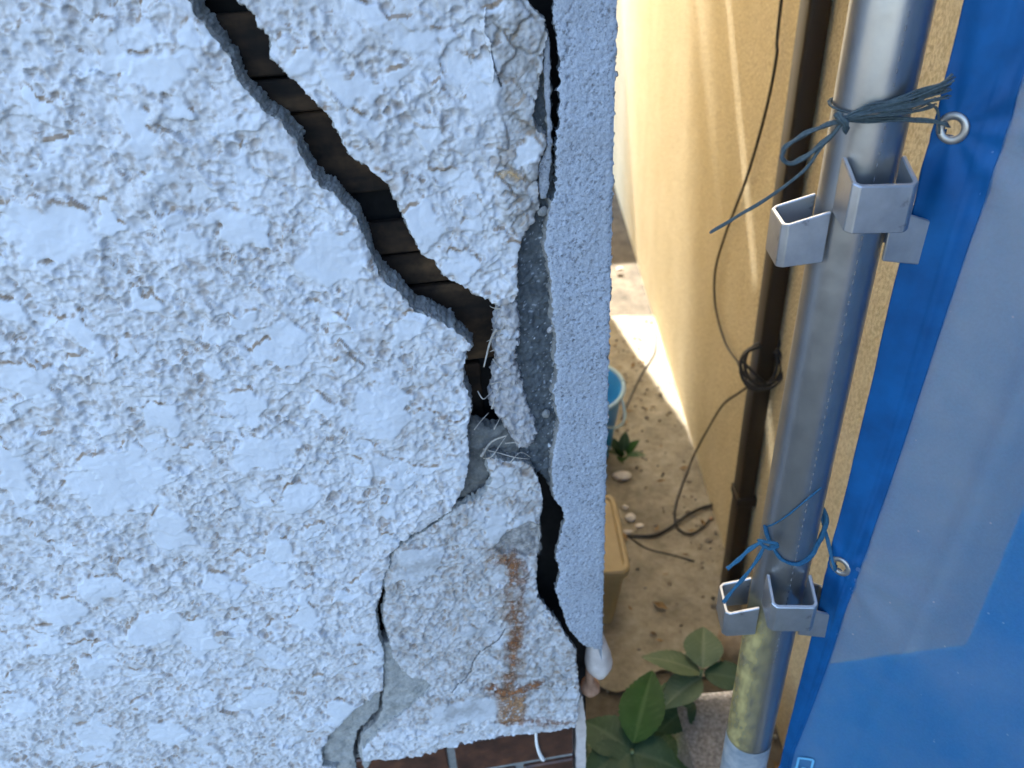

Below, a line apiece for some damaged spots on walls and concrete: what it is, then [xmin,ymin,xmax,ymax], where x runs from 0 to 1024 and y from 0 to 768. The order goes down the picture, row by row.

spalling [456,36,558,501]
crack [188,0,606,768]
rust [499,555,524,591]
spalling [495,521,540,555]
spalling [323,643,430,768]
rust [486,601,575,725]